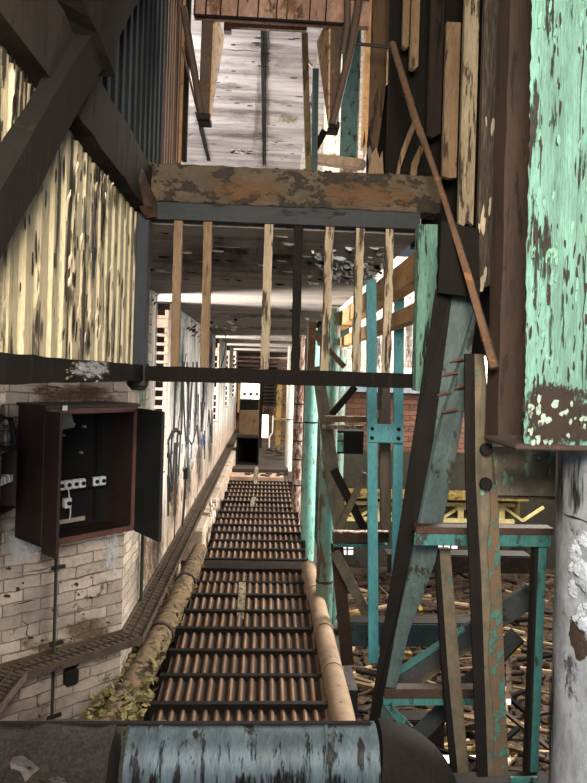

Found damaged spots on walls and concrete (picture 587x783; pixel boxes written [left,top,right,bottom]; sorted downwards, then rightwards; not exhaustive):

peeling [538,0,563,55]
peeling [522,169,587,478]
flaking render [569,616,587,661]